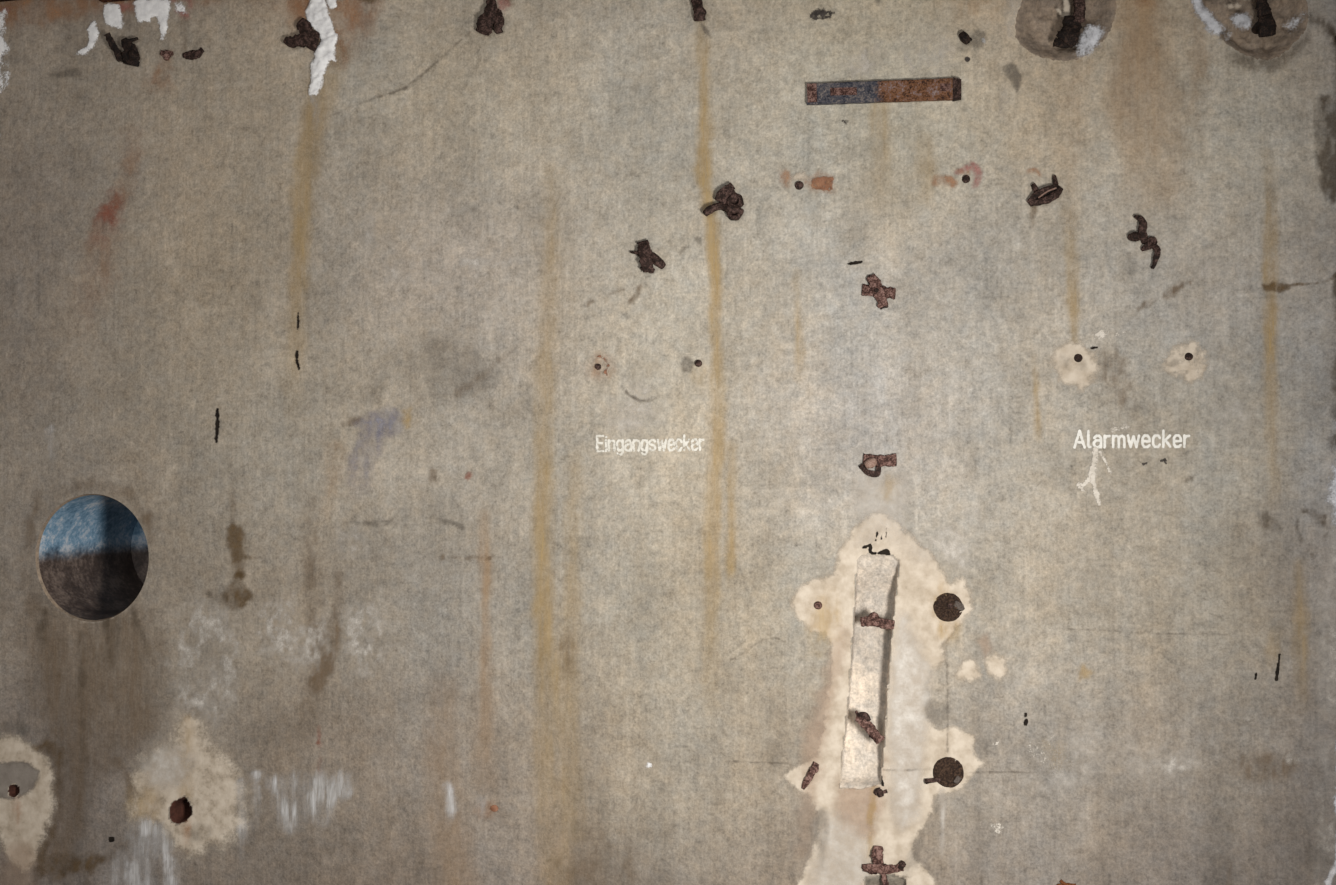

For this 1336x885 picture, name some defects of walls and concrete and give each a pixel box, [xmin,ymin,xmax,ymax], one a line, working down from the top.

peeling [1056,0,1070,17]
rust [182,48,204,60]
water stain [1322,460,1336,524]
spalling [8,784,20,797]
spalling [170,797,193,824]
water stain [1325,850,1336,885]